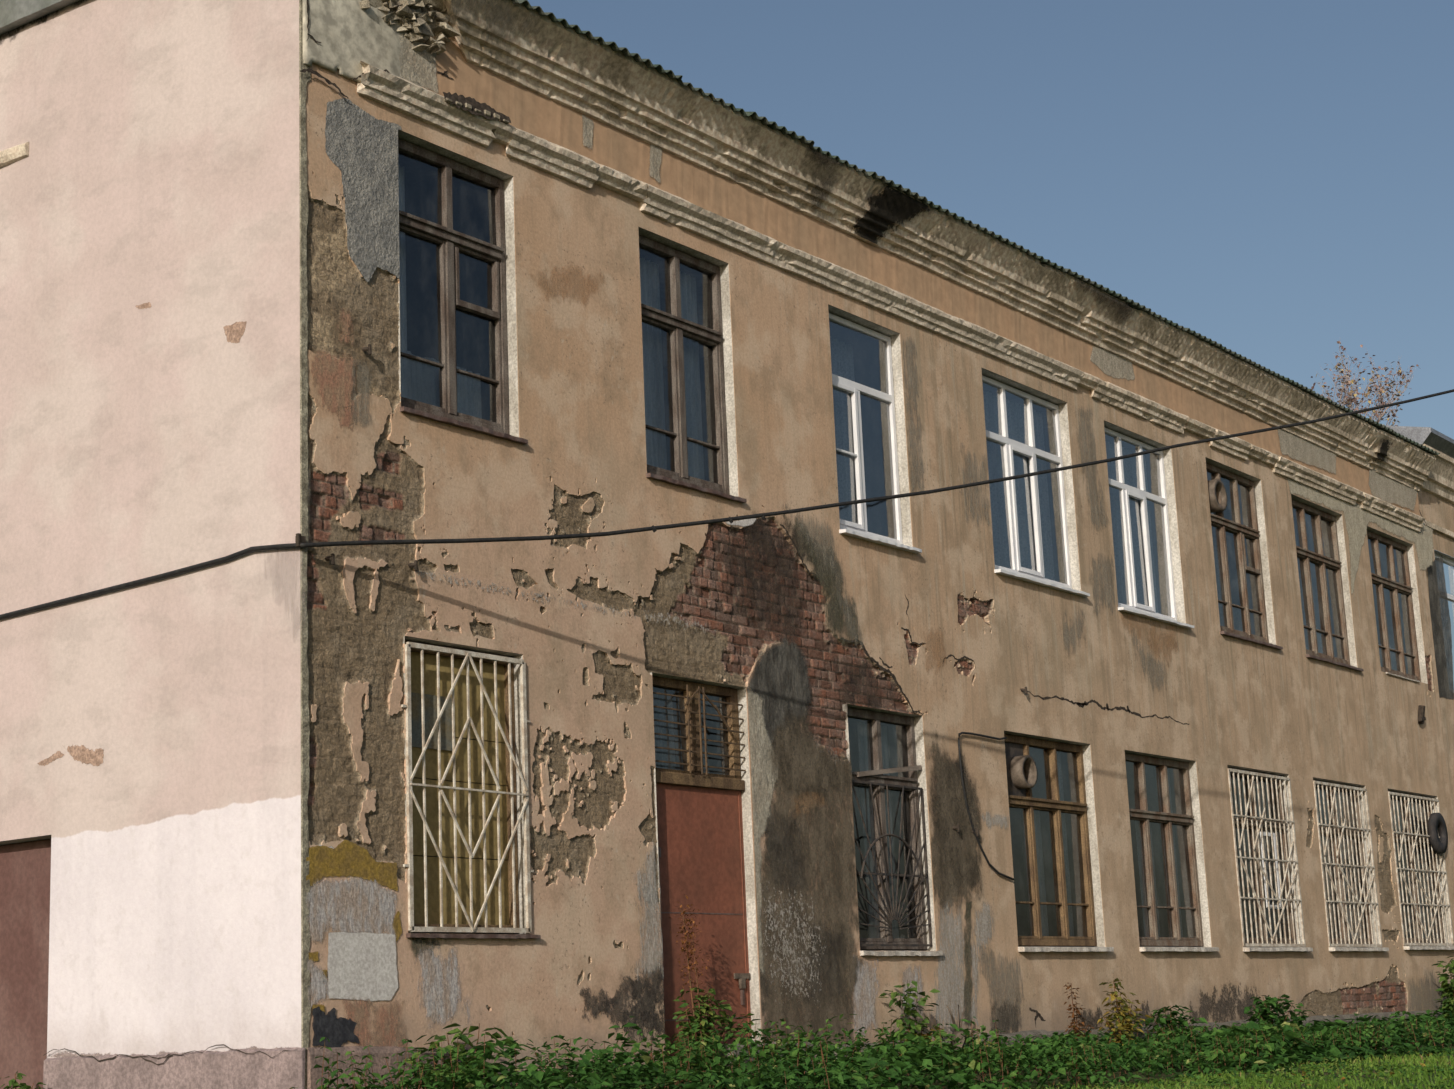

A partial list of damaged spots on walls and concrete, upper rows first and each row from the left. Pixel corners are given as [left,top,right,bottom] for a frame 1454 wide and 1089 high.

spalling [359,0,461,55]
damp [852,186,930,244]
flaking render [37,745,104,766]
flaking render [307,185,494,882]
peeling [529,702,660,911]
flaking render [511,477,928,763]
peeling [760,881,826,1005]
damp [758,715,861,1044]
flaking render [957,590,995,634]
damp [931,743,1021,1038]
crack [1020,688,1189,725]
flaking render [1298,815,1408,1016]